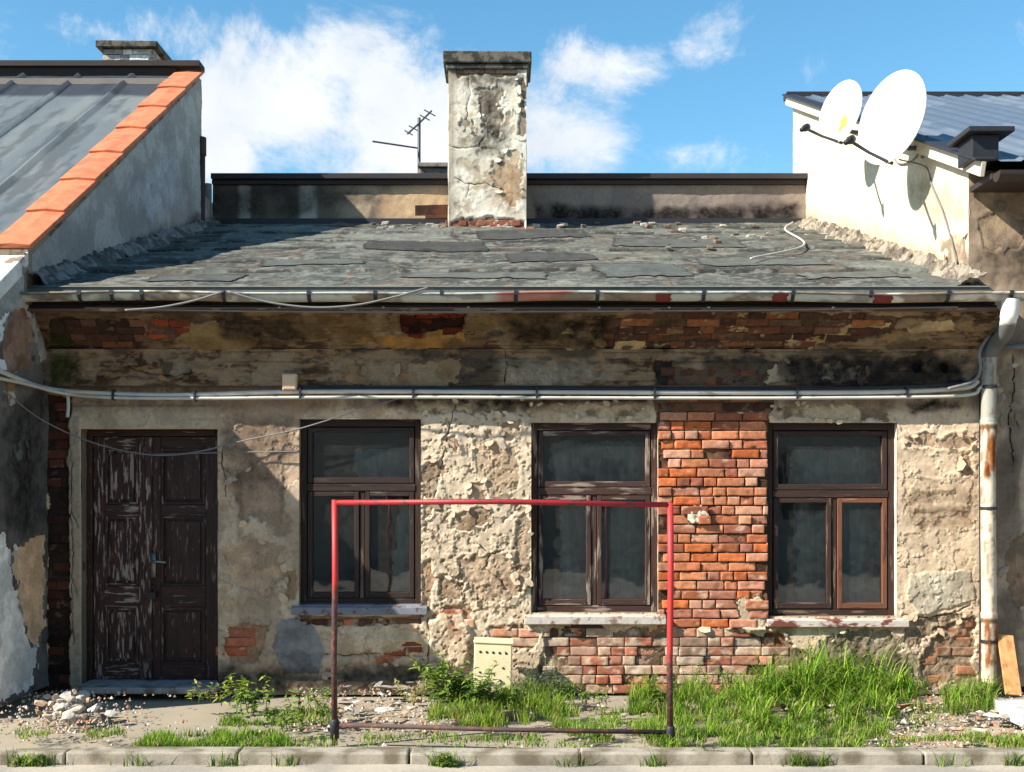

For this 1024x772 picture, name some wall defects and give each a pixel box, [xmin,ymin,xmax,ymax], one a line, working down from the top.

crack [452,77,491,149]
peeling [445,70,535,229]
flaking render [2,308,190,405]
flaking render [399,313,475,339]
corrosion [982,425,997,476]
crack [1008,353,1020,464]
flaking render [9,394,117,728]
flaking render [216,620,269,664]
peeling [220,462,299,604]
spalling [298,506,534,681]
flaking render [412,308,979,717]
corrosion [984,621,998,666]